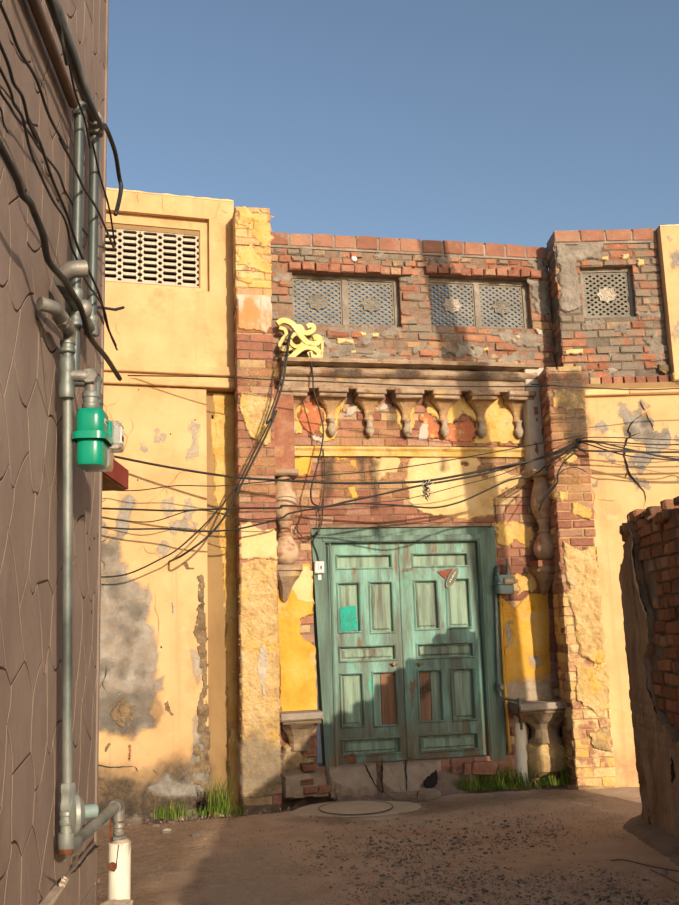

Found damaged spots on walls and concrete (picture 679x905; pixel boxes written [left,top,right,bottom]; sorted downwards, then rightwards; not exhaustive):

peeling [618,400,679,490]
leakage [99,495,162,736]
flaking render [124,393,300,828]
spalling [506,541,616,787]
flaking render [622,515,679,726]